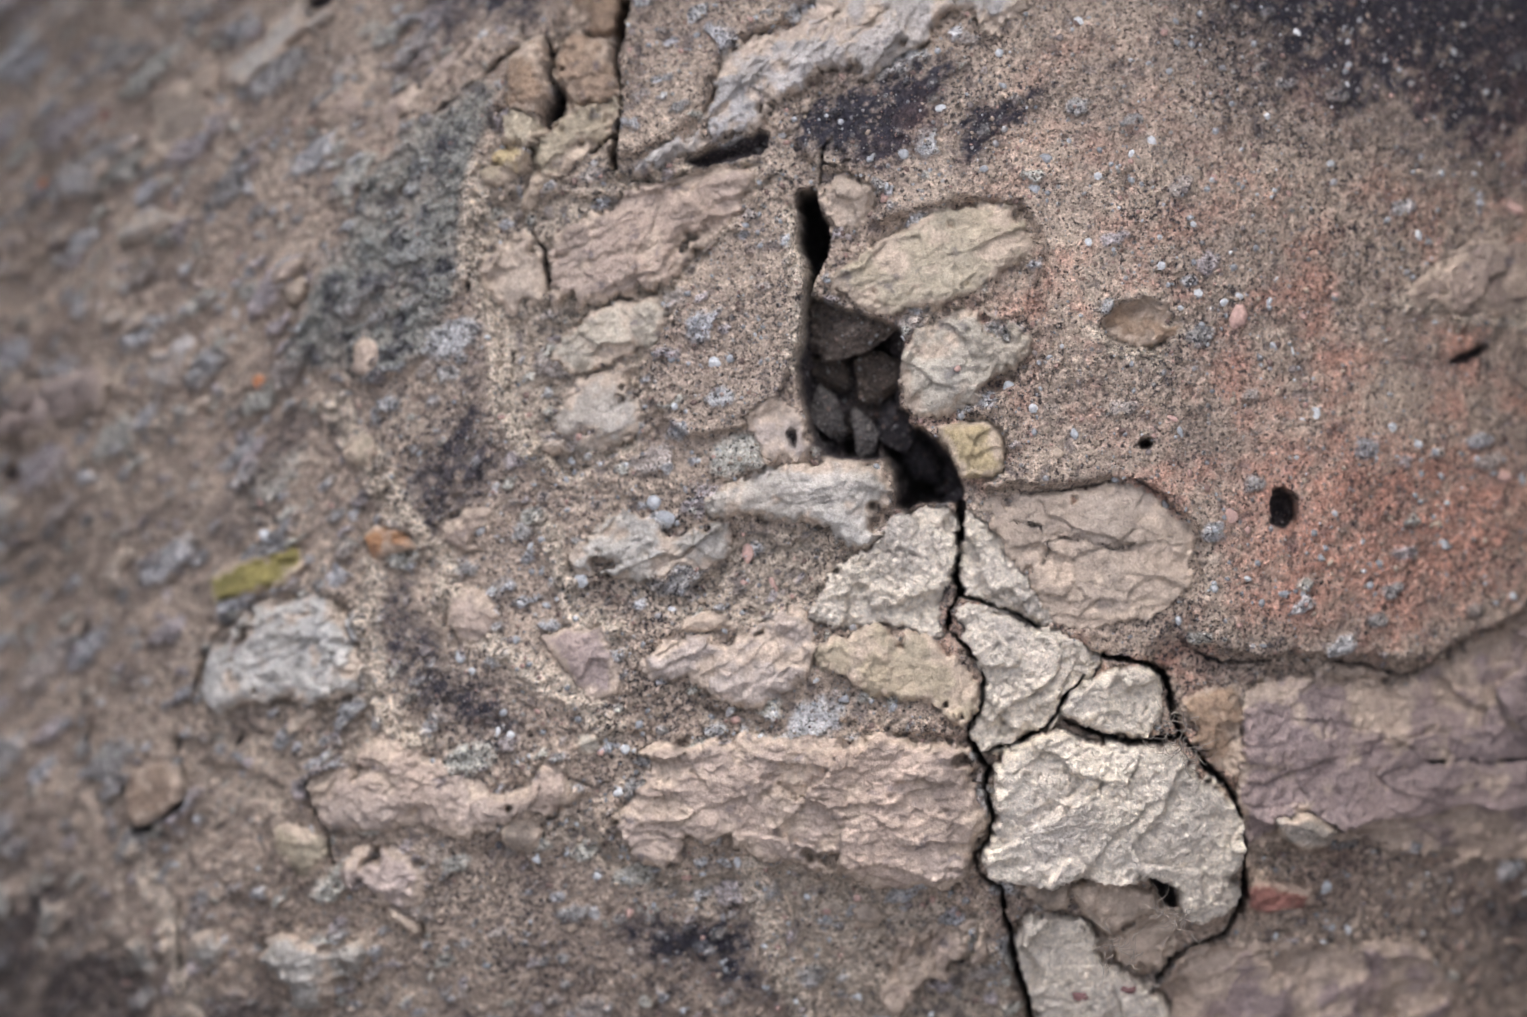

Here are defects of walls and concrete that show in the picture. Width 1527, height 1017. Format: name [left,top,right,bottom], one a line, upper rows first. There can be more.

crack [613,0,631,87]
crack [596,129,620,171]
crack [1024,475,1183,534]
crack [950,498,998,607]
crack [1104,542,1136,550]
crack [1318,658,1434,675]
crack [1497,756,1527,764]
crack [966,632,1273,1017]